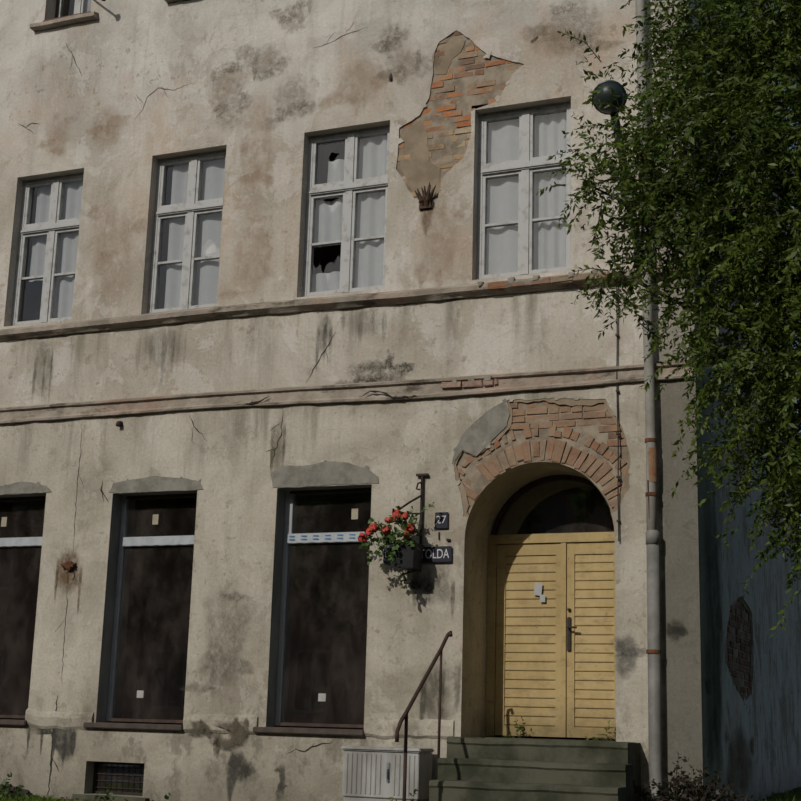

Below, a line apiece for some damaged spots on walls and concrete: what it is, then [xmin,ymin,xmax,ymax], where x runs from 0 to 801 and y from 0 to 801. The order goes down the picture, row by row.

flaking render [396,31,524,202]
crack [241,396,283,467]
flaking render [453,395,633,517]
corrosion [55,555,82,590]
flaking render [725,597,754,705]
crack [47,730,59,797]